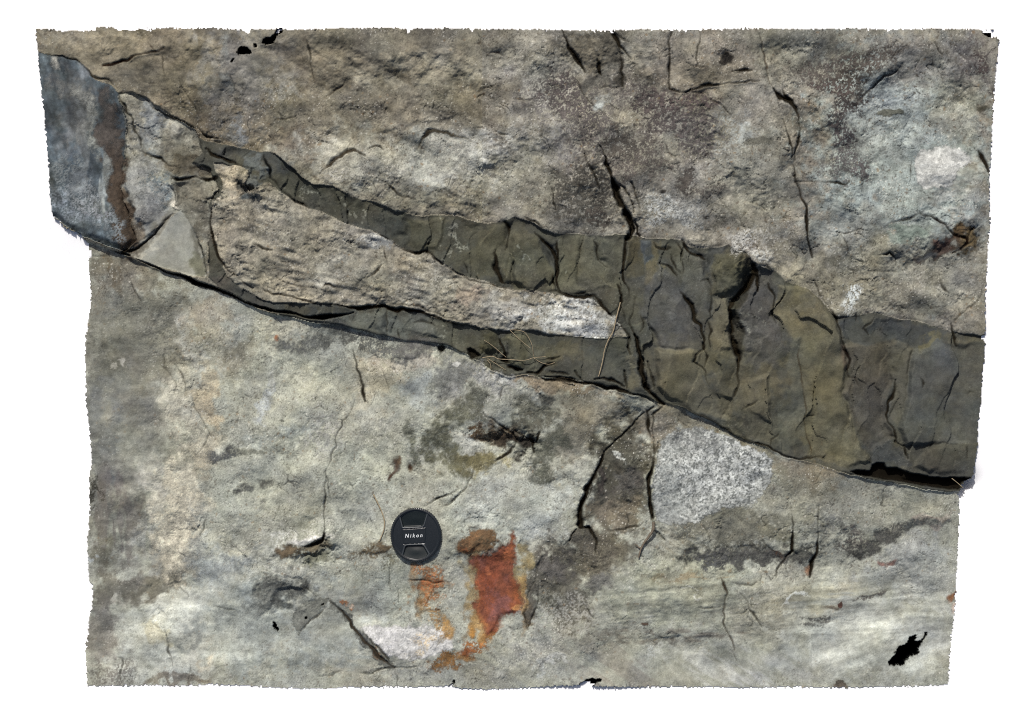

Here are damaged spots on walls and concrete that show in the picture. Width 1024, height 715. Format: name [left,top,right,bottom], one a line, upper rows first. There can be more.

crack [668,33,813,258]
crack [372,158,775,433]
crack [577,451,655,546]
crack [338,608,390,674]
rust [413,533,534,672]